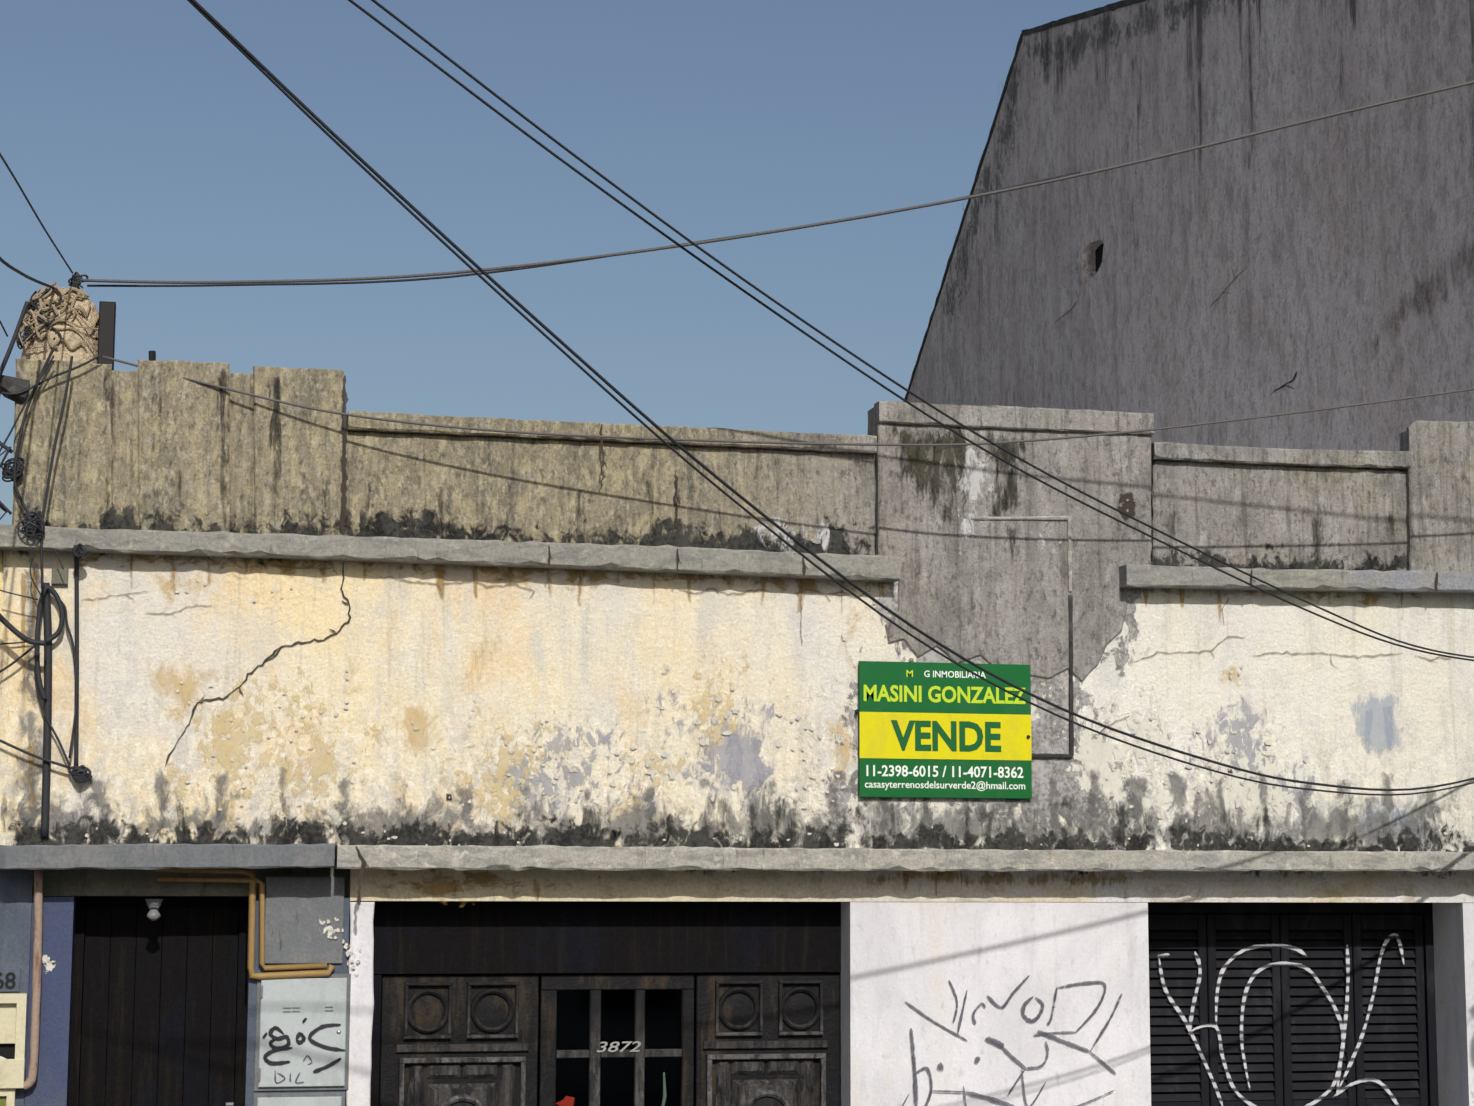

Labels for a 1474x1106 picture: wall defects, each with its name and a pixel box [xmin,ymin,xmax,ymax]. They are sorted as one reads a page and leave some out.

crack [165,375,351,766]
corrosion [400,564,444,597]
water stain [22,484,875,555]
crack [382,546,552,599]
corrosion [473,566,817,611]
peeling [866,581,989,664]
water stain [893,424,1025,554]
water stain [1151,514,1407,572]
peeling [157,666,383,835]
peeling [405,653,750,832]
water stain [3,550,1474,852]
peeling [949,588,1307,848]